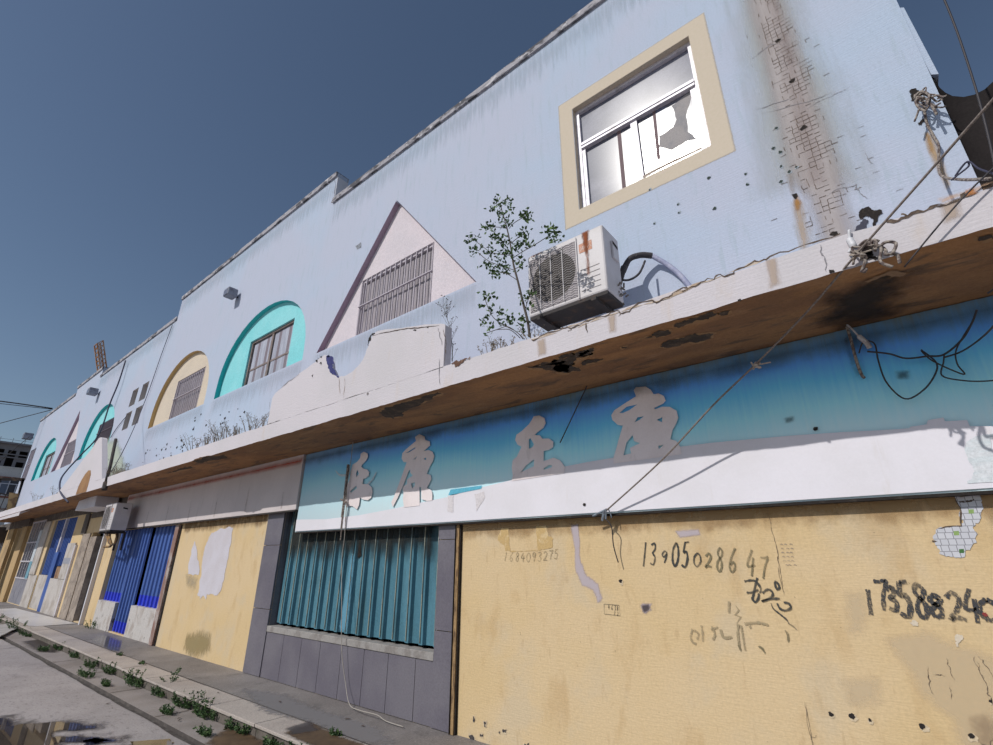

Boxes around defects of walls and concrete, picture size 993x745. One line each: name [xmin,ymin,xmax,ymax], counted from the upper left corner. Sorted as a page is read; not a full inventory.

damp [746,0,853,241]
spalling [855,206,883,231]
peeling [316,355,339,377]
peeling [368,325,446,419]
peeling [526,347,604,375]
peeling [188,541,200,575]